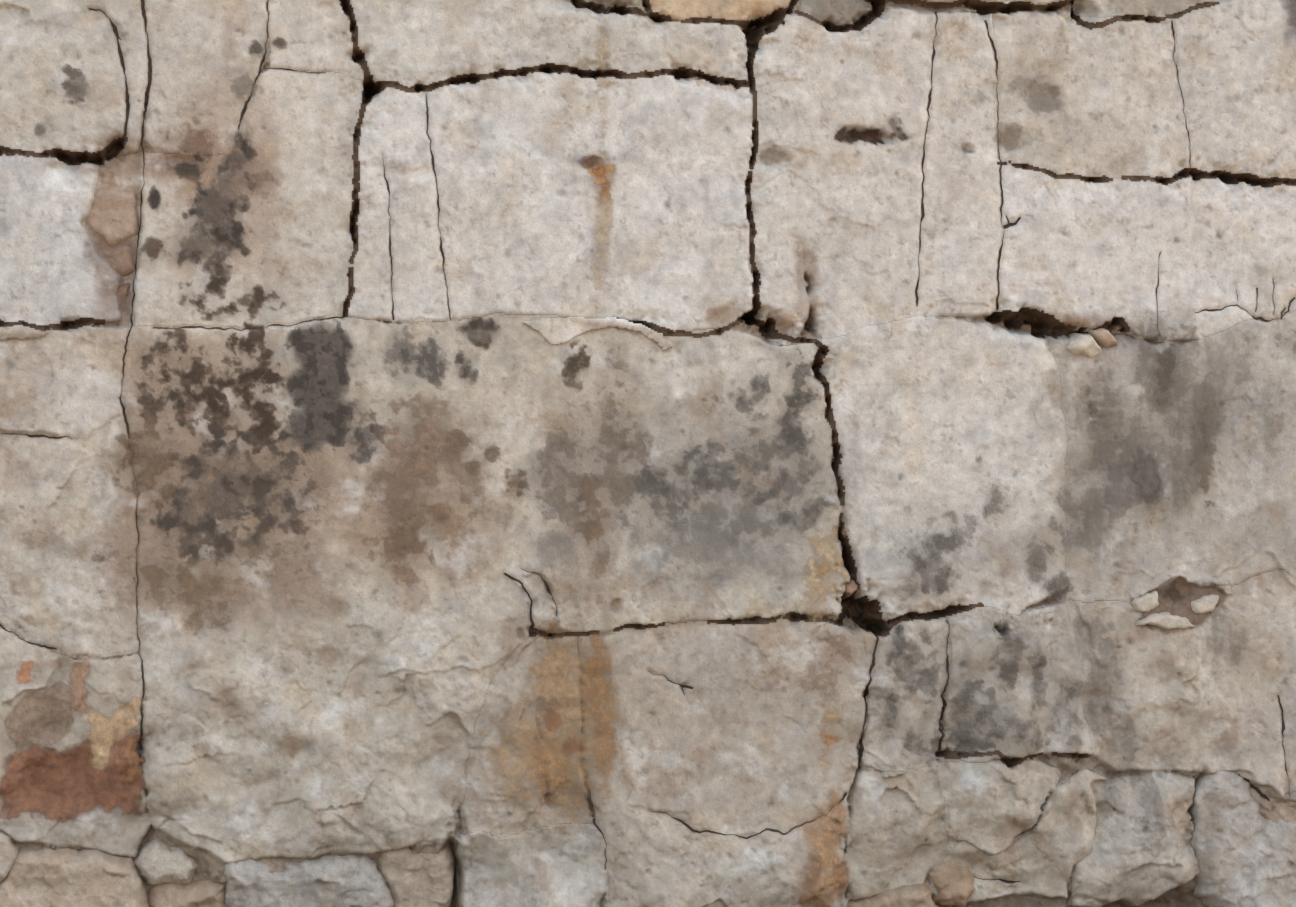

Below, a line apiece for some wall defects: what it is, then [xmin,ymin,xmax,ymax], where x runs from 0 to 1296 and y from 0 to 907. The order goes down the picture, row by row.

leakage [250,38,286,54]
crack [426,95,451,321]
rust [579,155,615,280]
leakage [835,119,908,145]
crack [915,12,938,306]
crack [984,20,1021,314]
crack [1171,20,1191,169]
leakage [116,131,829,630]
crack [1195,280,1296,322]
spalling [1130,577,1231,632]
spalling [0,660,145,823]
crack [649,636,879,839]